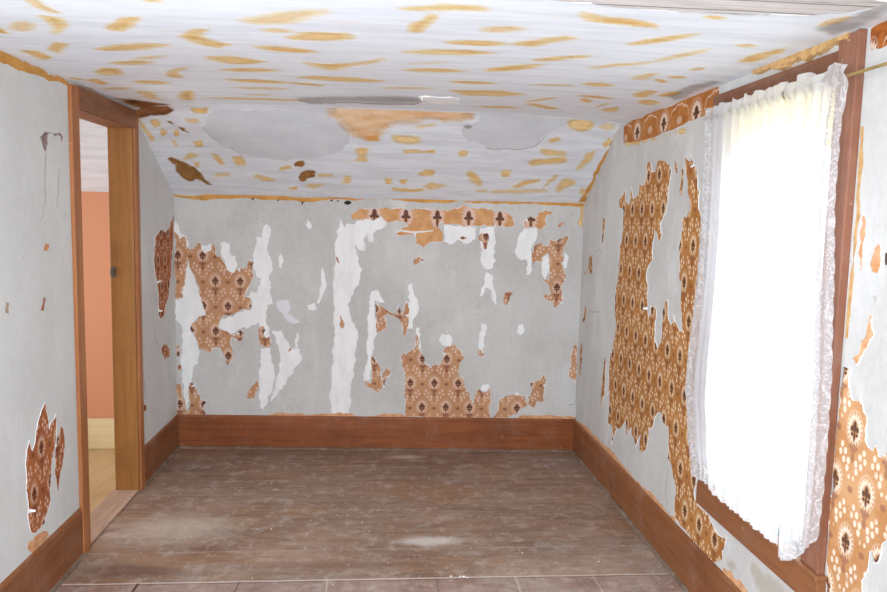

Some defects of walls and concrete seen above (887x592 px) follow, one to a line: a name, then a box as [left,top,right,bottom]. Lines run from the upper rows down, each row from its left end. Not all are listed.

peeling [550,0,887,16]
peeling [392,130,618,225]
peeling [174,194,364,202]
peeling [479,224,496,249]
peeling [162,344,182,370]